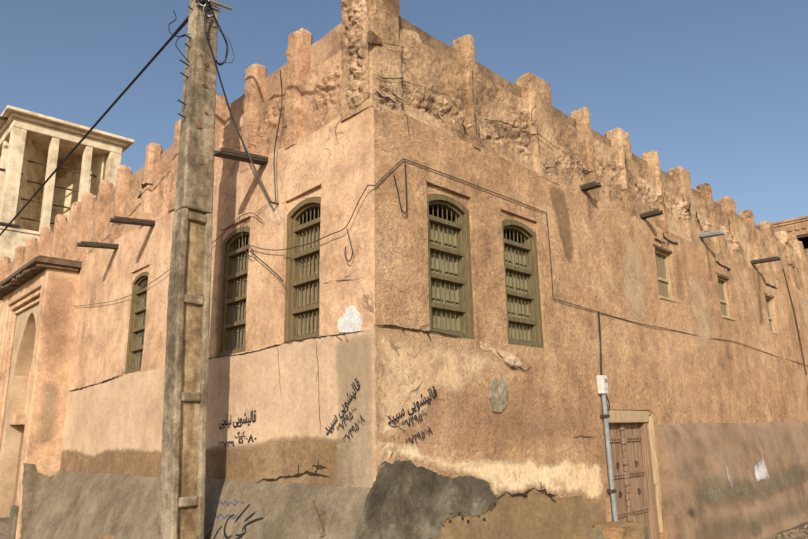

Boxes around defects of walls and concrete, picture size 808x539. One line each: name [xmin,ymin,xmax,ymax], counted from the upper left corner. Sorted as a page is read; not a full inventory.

flaking render [312,0,532,156]
crack [209,324,459,420]
flaking render [478,341,523,366]
damp [60,450,162,477]
damp [206,438,353,487]
crack [257,463,330,483]
flaking render [374,439,606,539]
crack [497,485,560,502]